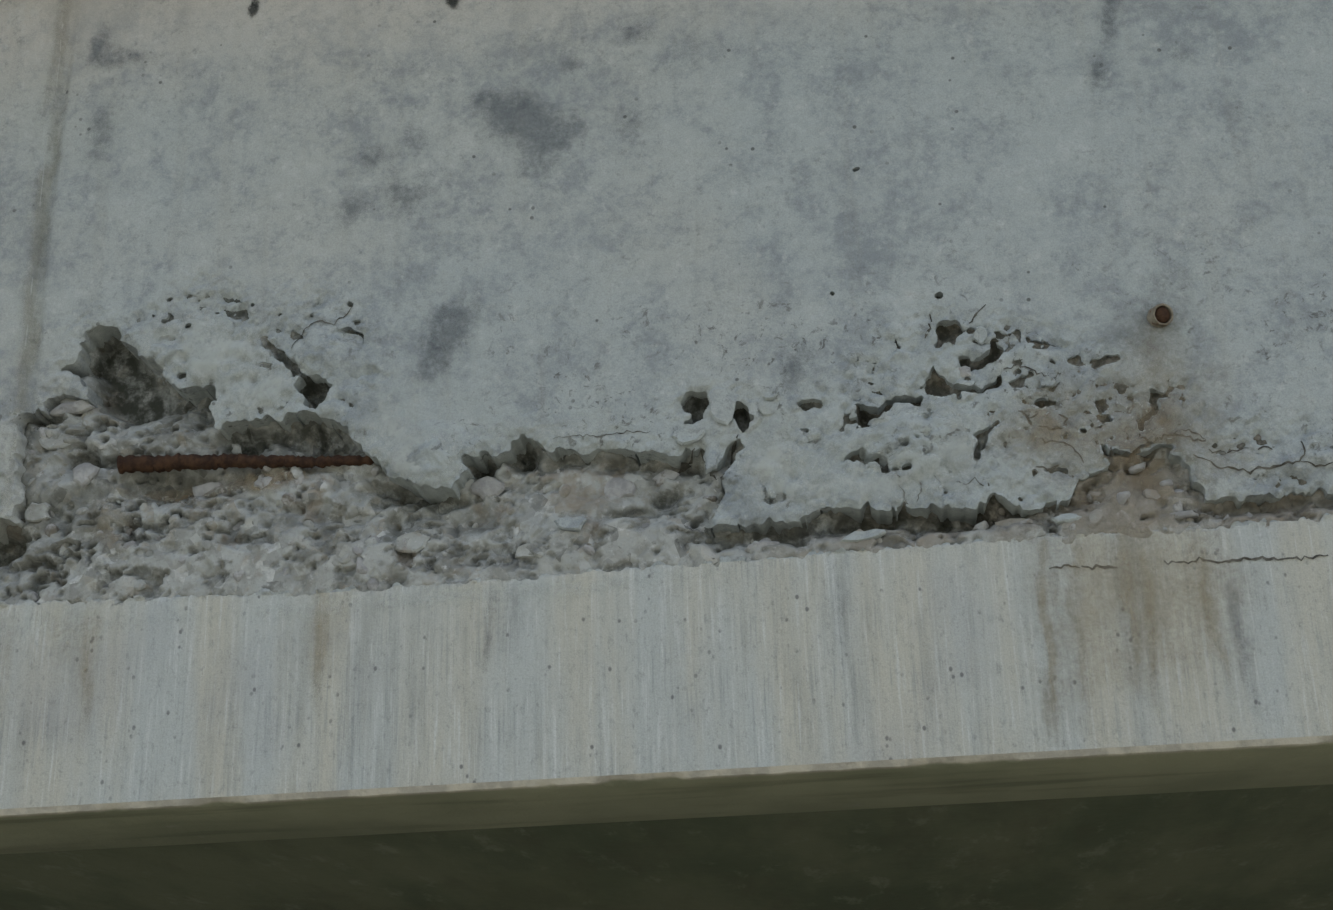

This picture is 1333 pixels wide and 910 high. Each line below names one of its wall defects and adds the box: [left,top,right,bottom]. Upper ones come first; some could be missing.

peeling [187,295,249,322]
spalling [0,324,1333,605]
crack [1049,563,1118,571]
crack [1164,554,1328,565]